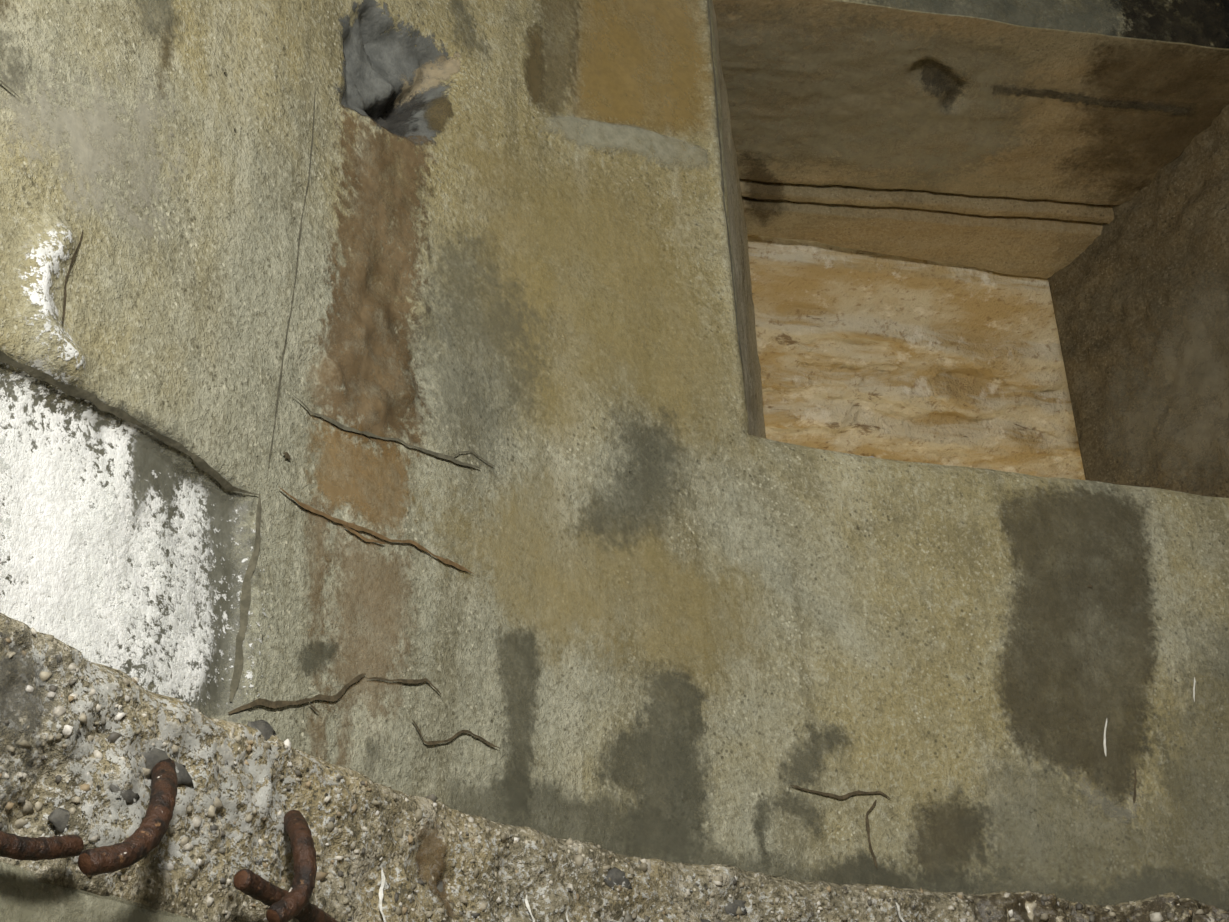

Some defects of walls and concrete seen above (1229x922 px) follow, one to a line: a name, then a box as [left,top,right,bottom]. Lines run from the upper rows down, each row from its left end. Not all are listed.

leakage [140,0,171,66]
spalling [337,0,461,145]
corrosion [312,108,435,533]
crack [279,487,474,574]
crack [228,673,441,714]
crack [412,719,499,748]
spalling [0,759,178,876]
spalling [233,810,338,922]
corrosion [416,821,455,917]
crack [790,785,890,869]